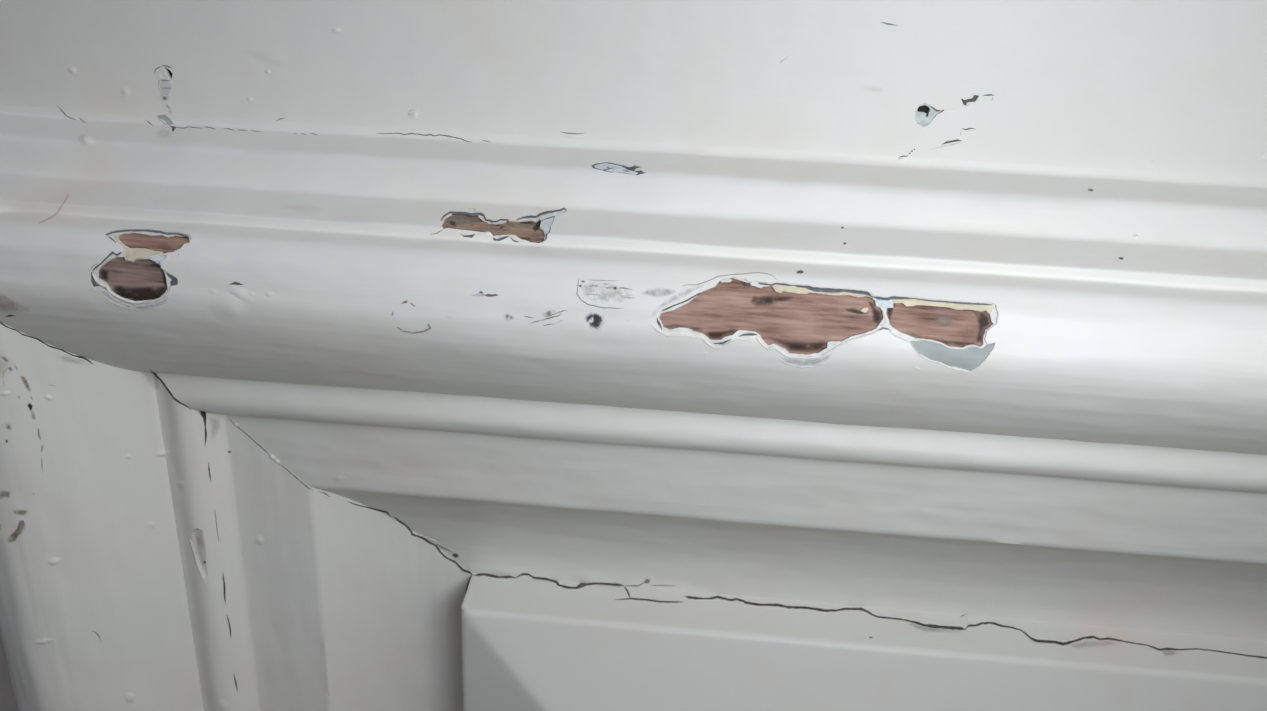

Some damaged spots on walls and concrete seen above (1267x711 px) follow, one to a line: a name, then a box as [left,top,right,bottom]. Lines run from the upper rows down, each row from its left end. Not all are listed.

peeling [430,208,567,243]
peeling [91,229,191,310]
crack [0,321,94,365]
peeling [653,272,998,373]
crack [149,369,1267,659]